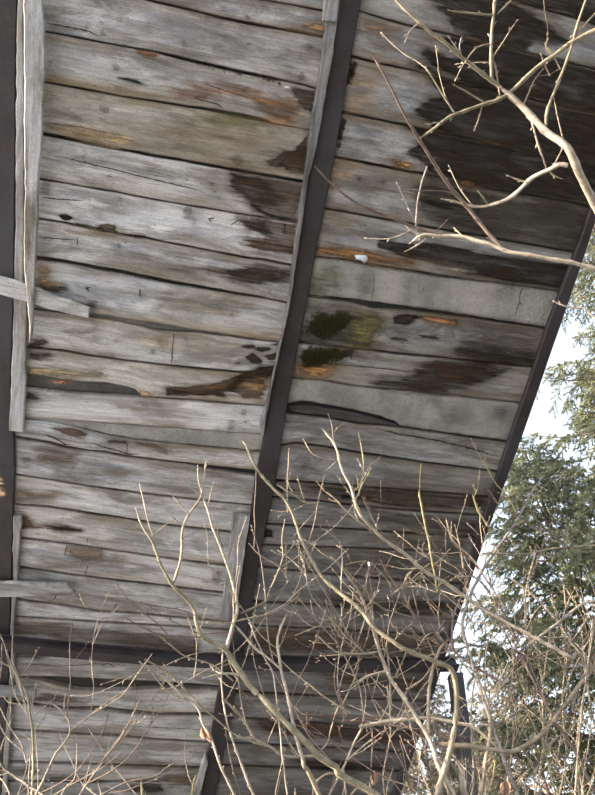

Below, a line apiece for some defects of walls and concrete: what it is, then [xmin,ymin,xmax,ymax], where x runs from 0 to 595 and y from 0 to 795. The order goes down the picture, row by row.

leakage [406,0,595,249]
leakage [230,173,302,254]
leakage [166,365,274,399]
leakage [369,326,540,392]